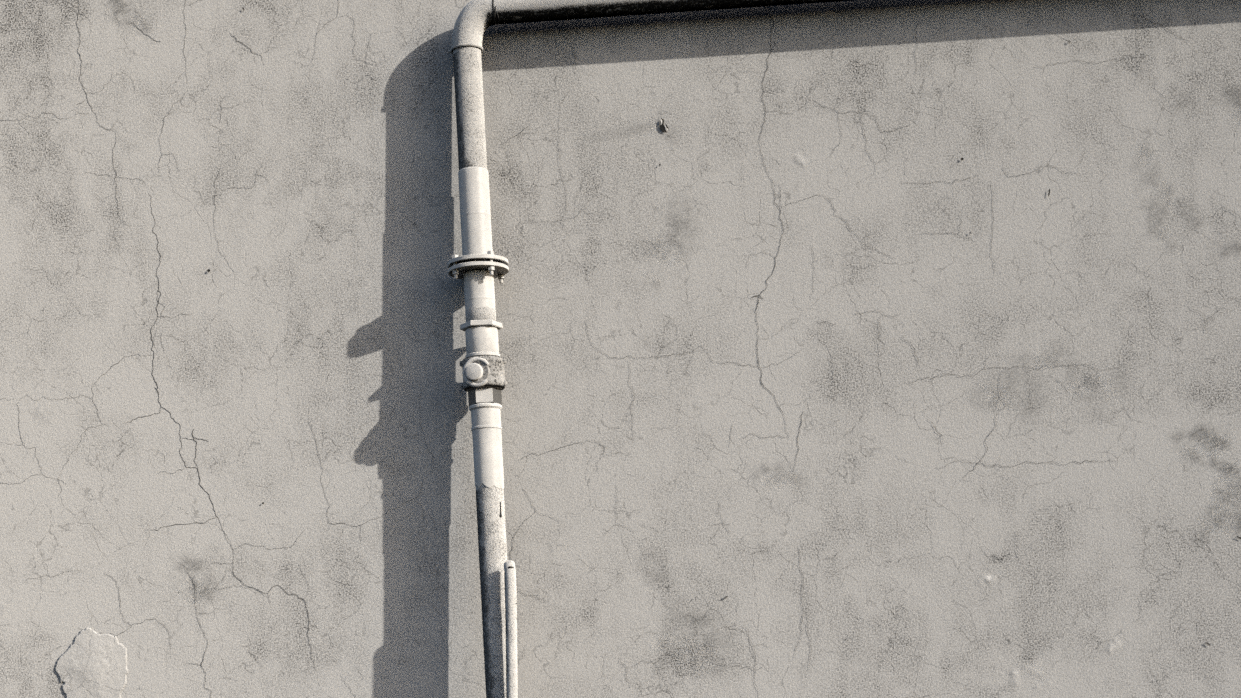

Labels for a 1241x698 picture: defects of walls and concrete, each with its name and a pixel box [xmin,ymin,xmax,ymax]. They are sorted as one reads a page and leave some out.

crack [1,12,319,696]
crack [588,6,910,465]
crack [811,255,1116,473]